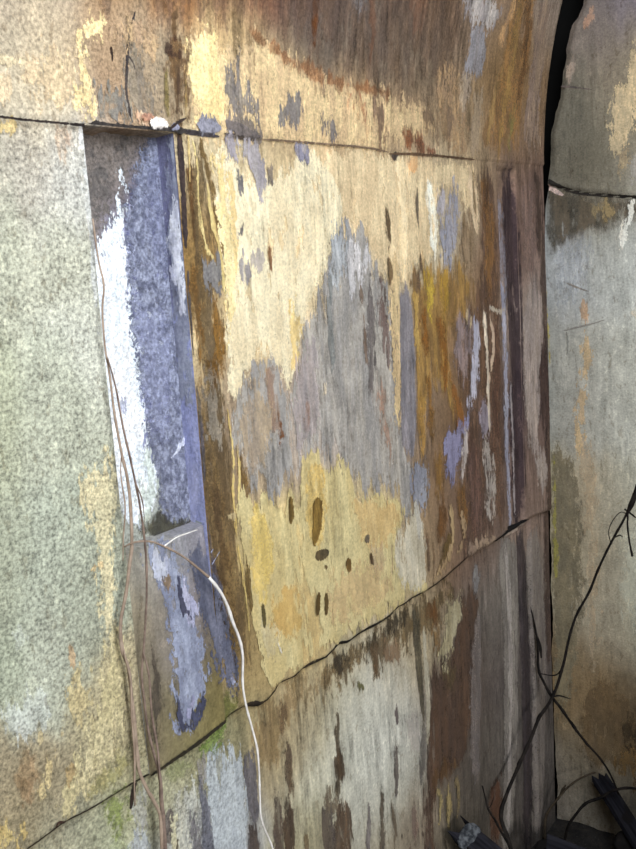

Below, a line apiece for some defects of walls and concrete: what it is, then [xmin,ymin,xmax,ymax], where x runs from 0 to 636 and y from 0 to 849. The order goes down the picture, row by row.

crack [0,12,474,160]
crack [548,179,636,199]
corrosion [186,137,255,667]
crack [494,519,529,542]
crack [27,558,467,849]
damp [412,604,431,783]
damp [320,710,354,849]
damp [365,737,419,849]
damp [457,822,481,849]